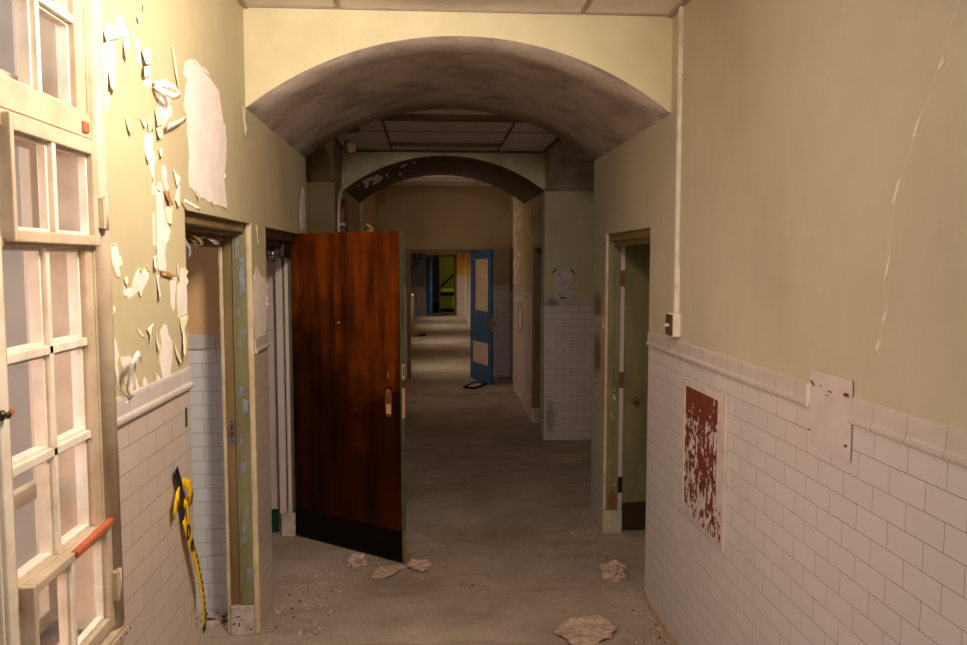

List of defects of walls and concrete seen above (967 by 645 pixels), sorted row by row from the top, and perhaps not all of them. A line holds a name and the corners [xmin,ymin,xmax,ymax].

peeling [103,4,268,404]
peeling [357,162,416,189]
crack [875,1,960,363]